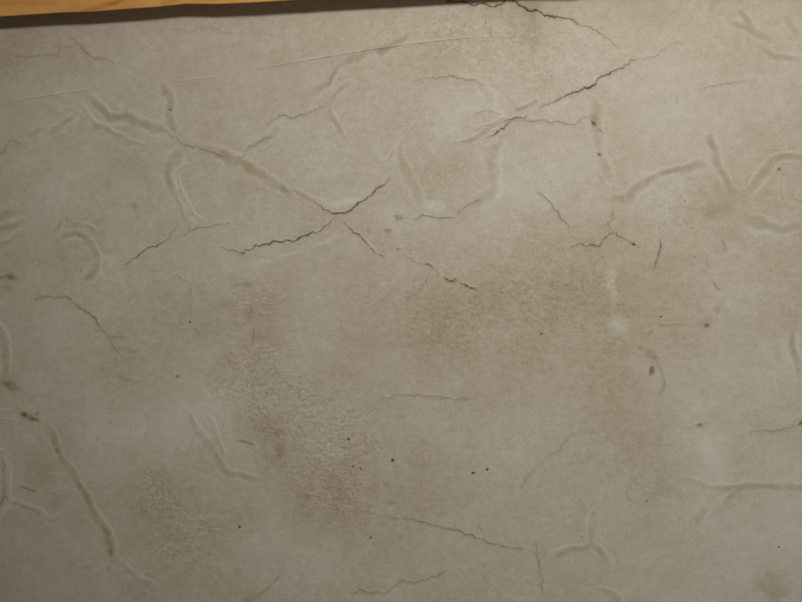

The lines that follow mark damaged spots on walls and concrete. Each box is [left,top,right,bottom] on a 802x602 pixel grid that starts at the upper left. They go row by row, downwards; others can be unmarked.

crack [393,0,681,141]
crack [159,104,327,161]
crack [120,175,483,293]
crack [534,189,642,252]
crack [26,293,129,358]
crack [0,457,42,516]